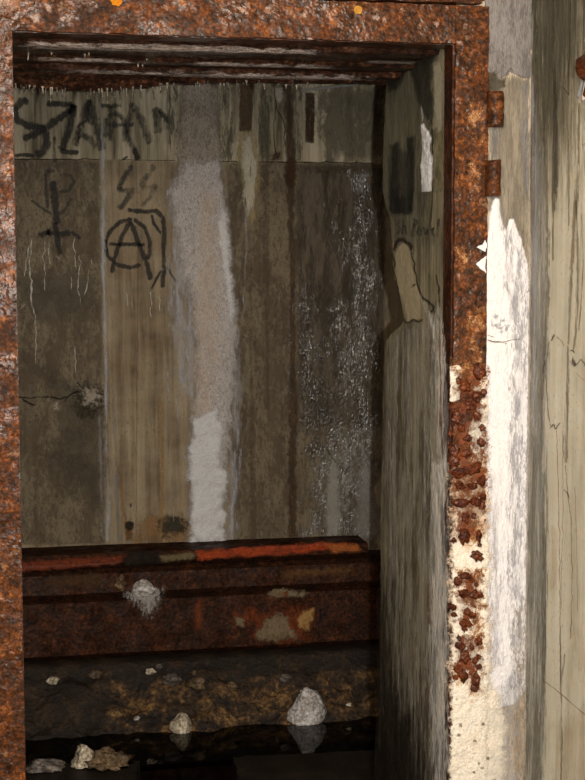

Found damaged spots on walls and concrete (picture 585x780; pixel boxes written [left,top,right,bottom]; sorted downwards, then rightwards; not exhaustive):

leakage [21,42,287,54]
rust [239,84,254,132]
rust [305,92,315,143]
crack [19,382,104,406]
spalling [71,382,105,419]
leakage [134,0,585,780]
rust [439,307,490,702]
crack [542,336,585,714]